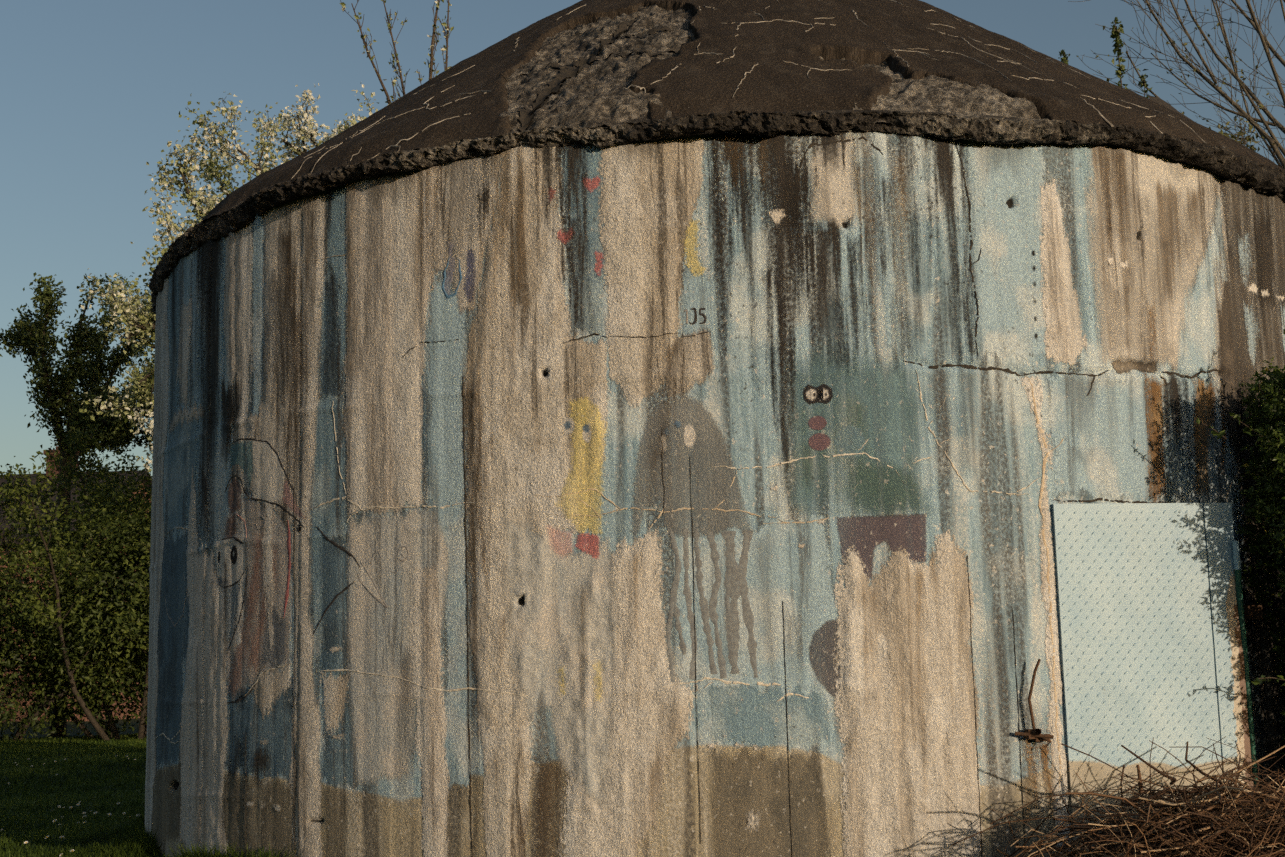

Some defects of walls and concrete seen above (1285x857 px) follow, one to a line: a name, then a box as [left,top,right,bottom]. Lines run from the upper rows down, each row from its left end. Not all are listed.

crack [291,65,487,179]
crack [624,0,1225,148]
spalling [841,58,1042,126]
water stain [195,229,241,535]
peeling [179,191,350,857]
peeling [342,4,714,857]
water stain [707,133,975,478]
crack [534,136,1187,836]
rust [1145,376,1166,502]
rust [1194,379,1226,492]
water stain [1214,176,1285,806]
peeling [832,529,984,857]